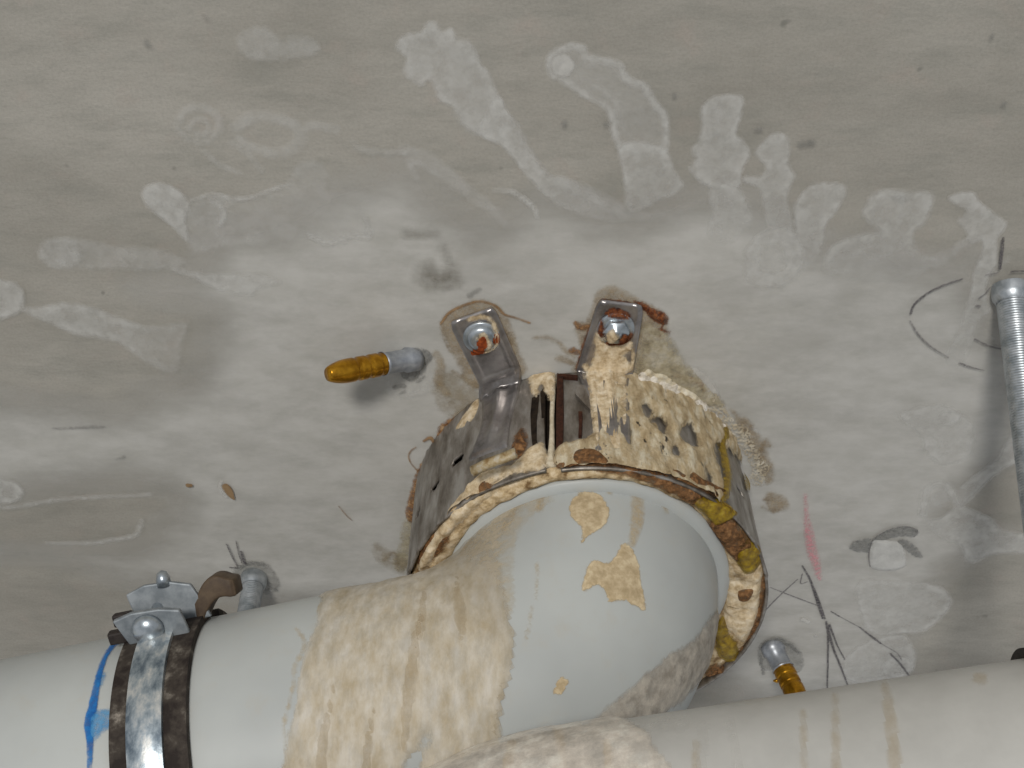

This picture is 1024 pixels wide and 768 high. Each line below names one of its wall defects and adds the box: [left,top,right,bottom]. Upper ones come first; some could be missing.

water stain [399,24,543,187]
water stain [547,46,593,97]
water stain [606,60,671,187]
water stain [0,184,1015,768]